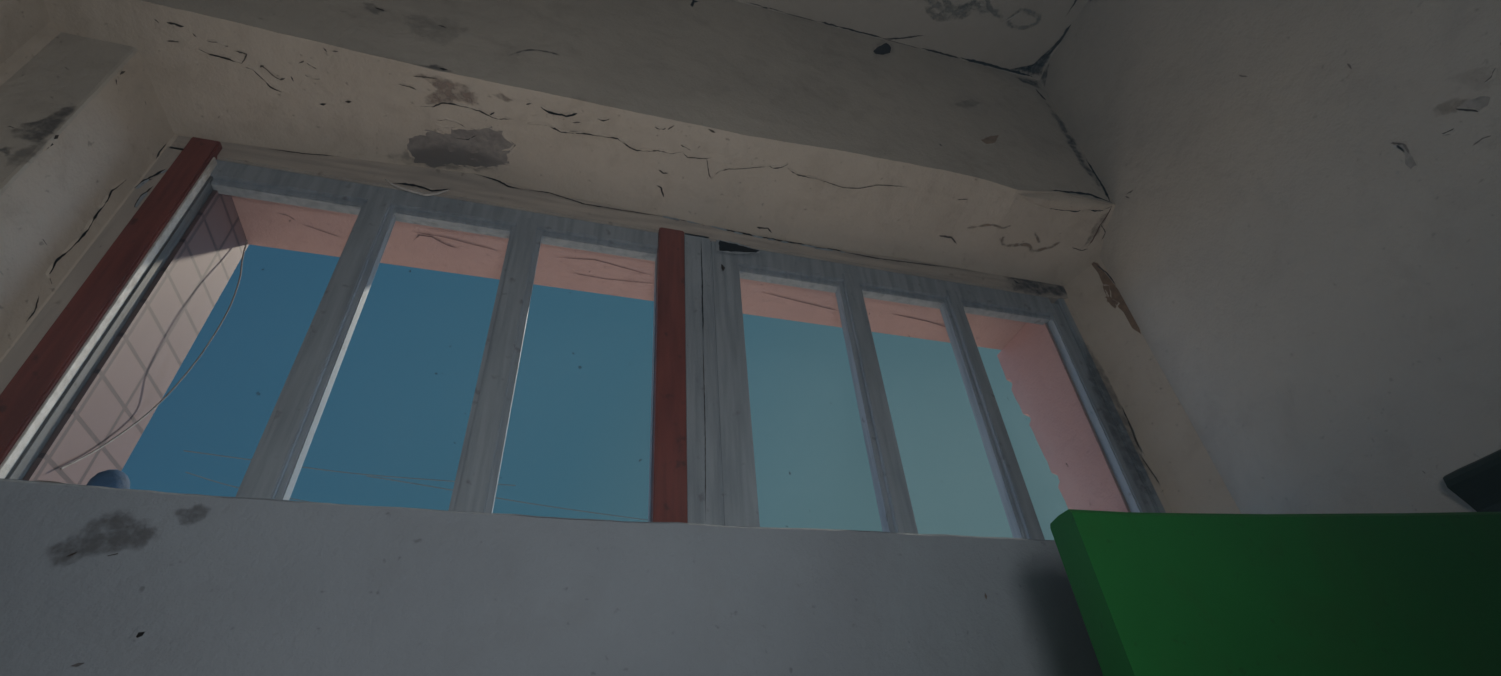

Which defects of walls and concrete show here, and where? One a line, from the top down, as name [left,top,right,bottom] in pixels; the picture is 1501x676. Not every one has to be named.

crack [26,145,167,322]
peeling [385,179,449,196]
spalling [403,80,518,170]
crack [399,76,949,521]
crack [734,0,1110,201]
spalling [1072,208,1142,336]